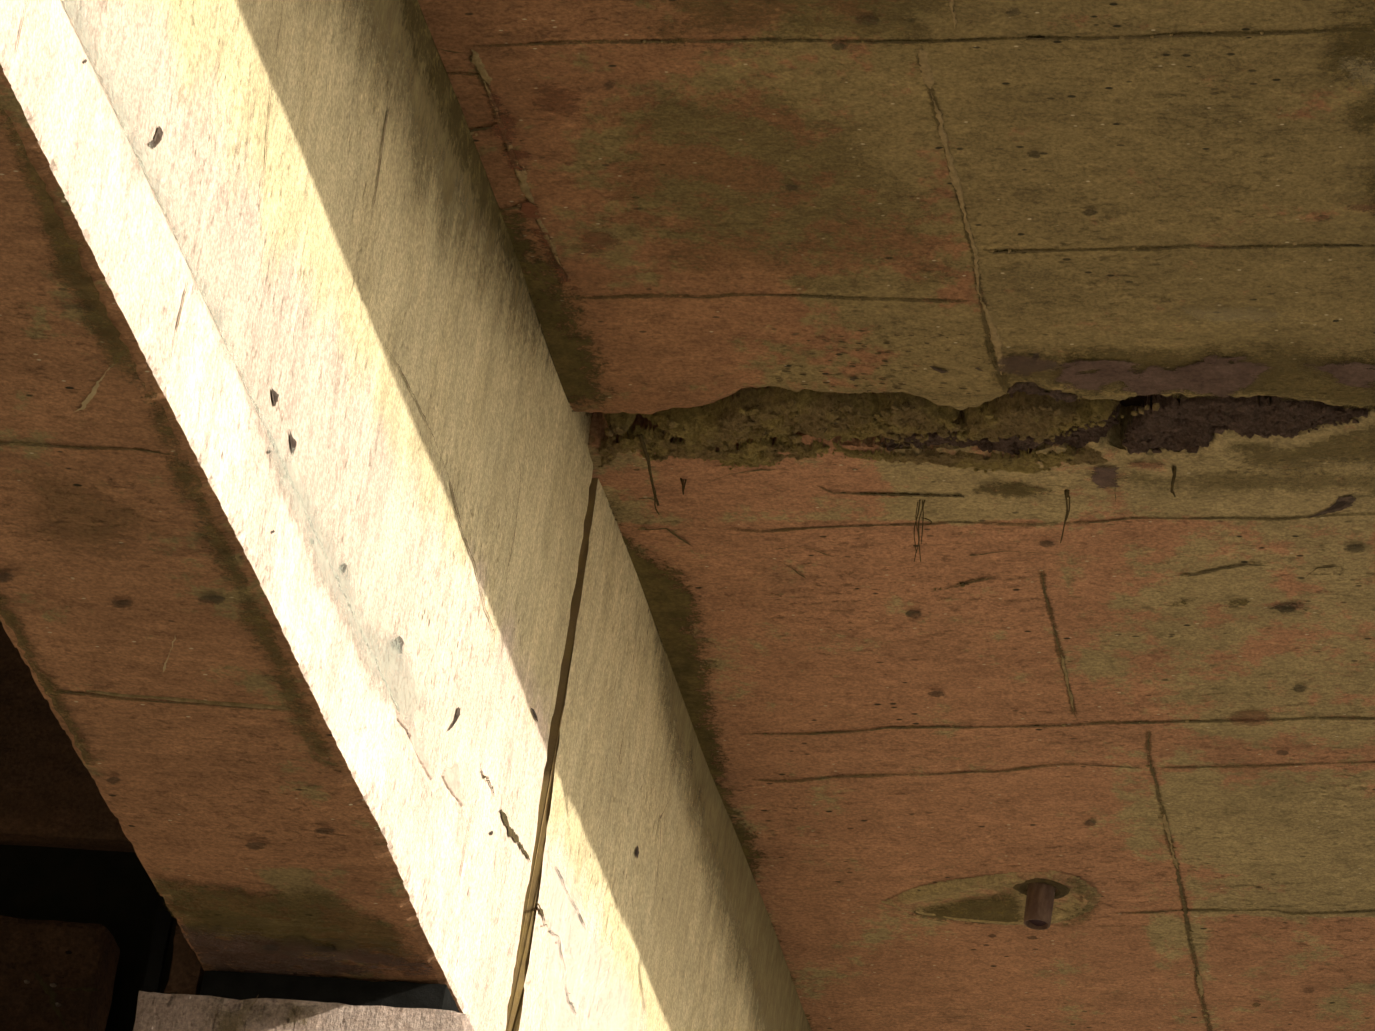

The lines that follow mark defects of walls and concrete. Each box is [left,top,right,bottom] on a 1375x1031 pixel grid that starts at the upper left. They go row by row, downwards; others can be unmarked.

spalling [775,328,984,394]
spalling [598,355,1368,488]
crack [637,475,1375,1031]
crack [457,770,585,1014]